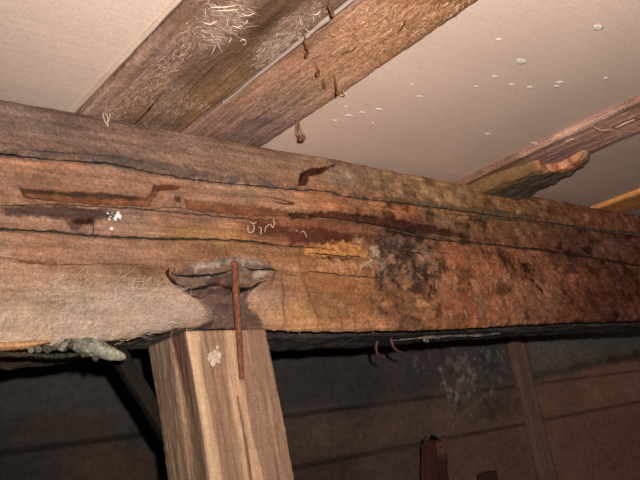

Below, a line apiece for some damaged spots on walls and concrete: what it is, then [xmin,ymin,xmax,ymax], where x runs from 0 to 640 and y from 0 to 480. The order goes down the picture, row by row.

water stain [79,151,309,190]
water stain [374,237,437,299]
water stain [393,333,521,422]